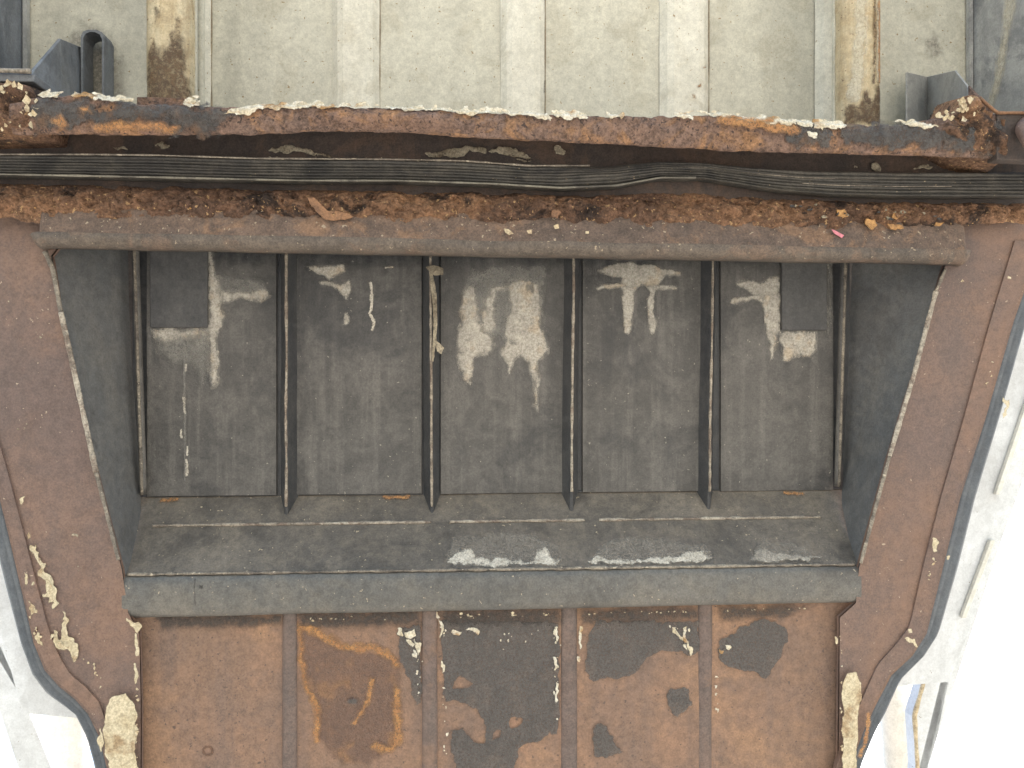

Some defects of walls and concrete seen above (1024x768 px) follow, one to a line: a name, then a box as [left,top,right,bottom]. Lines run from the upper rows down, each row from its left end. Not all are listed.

corrosion [0,0,1024,173]
corrosion [0,184,1024,230]
leakage [154,252,268,477]
leakage [457,265,548,398]
leakage [597,262,680,333]
leakage [731,277,816,361]
peeling [25,532,102,688]
peeling [97,618,142,768]
peeling [397,627,423,694]
leakage [448,534,558,568]
peeling [553,627,561,702]
peeling [835,636,862,768]